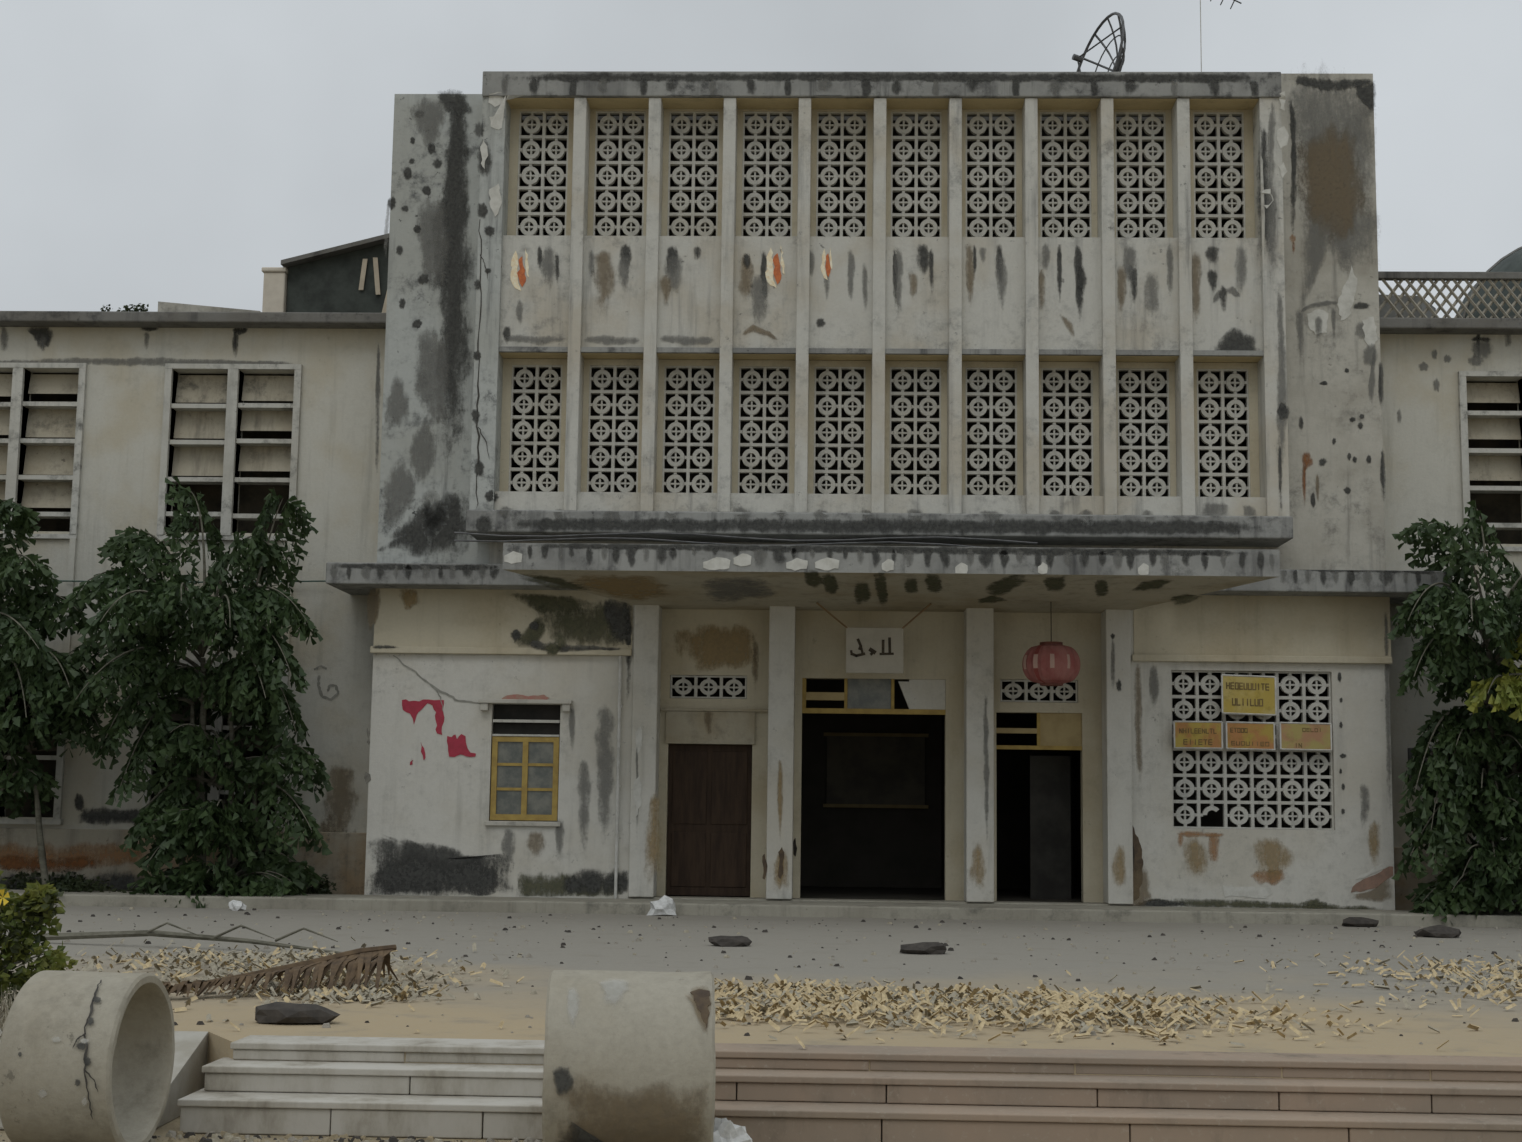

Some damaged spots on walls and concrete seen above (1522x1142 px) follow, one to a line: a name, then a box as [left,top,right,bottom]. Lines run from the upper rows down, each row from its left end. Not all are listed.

water stain [331,77,1451,678]
peeling [402,699,476,757]
water stain [579,710,612,828]
water stain [370,824,628,897]
crack [73,980,102,1119]